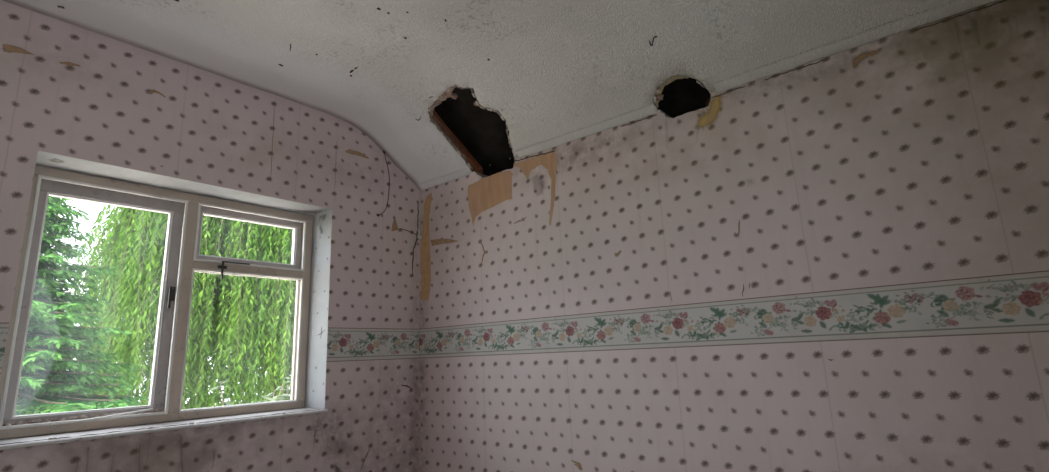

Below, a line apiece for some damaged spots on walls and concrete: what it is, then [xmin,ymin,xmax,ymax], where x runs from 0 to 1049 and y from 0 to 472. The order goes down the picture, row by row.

flaking render [428,84,514,170]
flaking render [654,74,705,107]